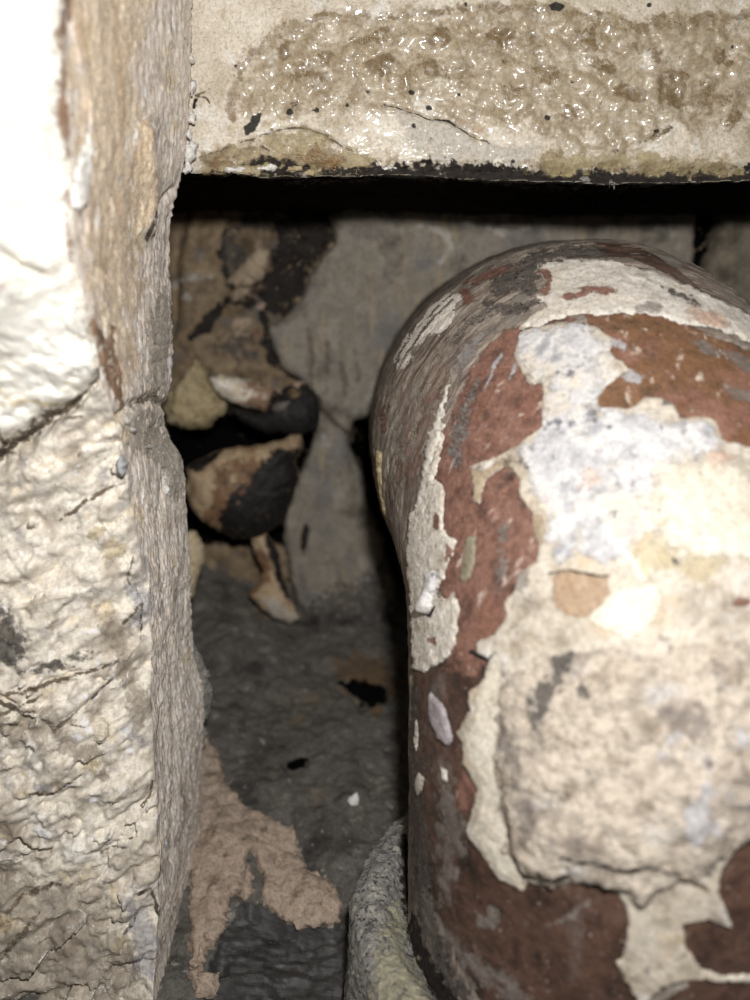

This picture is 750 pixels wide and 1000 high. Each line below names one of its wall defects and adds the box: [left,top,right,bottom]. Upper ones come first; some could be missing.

crack [384,104,490,144]
leakage [199,0,750,181]
corrosion [596,242,700,290]
corrosion [395,362,450,493]
corrosion [548,312,750,447]
peeling [374,258,750,892]
crack [0,655,121,733]
corrosion [408,325,636,1000]
crack [0,882,79,960]
crack [123,887,160,935]
peeling [606,842,750,1000]
corrosion [667,839,750,1000]